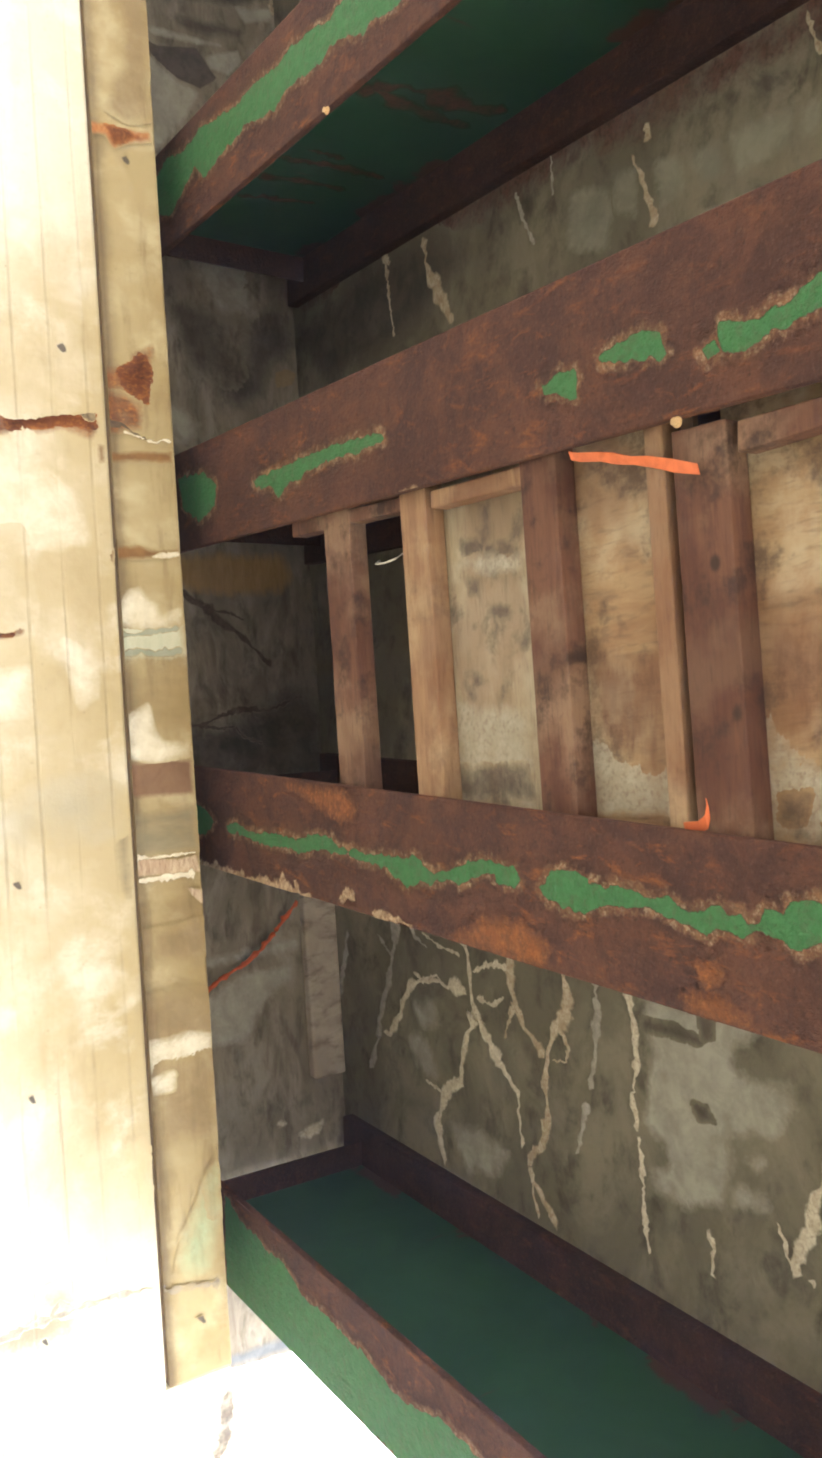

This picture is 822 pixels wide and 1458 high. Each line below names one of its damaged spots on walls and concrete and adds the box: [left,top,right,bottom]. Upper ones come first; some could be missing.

peeling [149,0,410,223]
rust [438,0,822,234]
peeling [534,260,822,412]
rust [0,343,173,465]
peeling [176,465,265,547]
water stain [758,600,822,846]
rust [284,780,359,827]
peeling [137,798,822,966]
rust [443,911,555,969]
water stain [639,1014,716,1048]
water stain [448,1119,513,1181]
water stain [776,1162,822,1289]